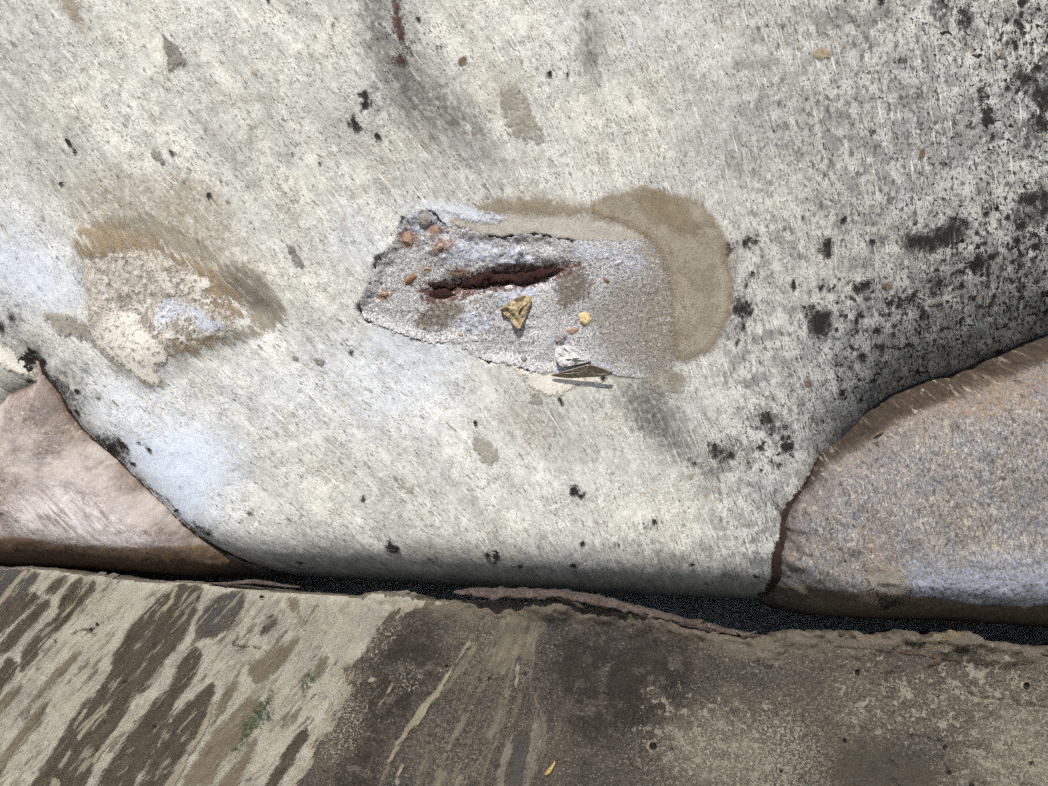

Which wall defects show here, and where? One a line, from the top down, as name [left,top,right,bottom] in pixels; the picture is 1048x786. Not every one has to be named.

spalling [357,211,676,404]
water stain [429,187,758,397]
water stain [794,182,1048,406]
water stain [265,728,308,786]
water stain [311,656,328,678]
water stain [337,613,548,786]
water stain [553,635,691,743]